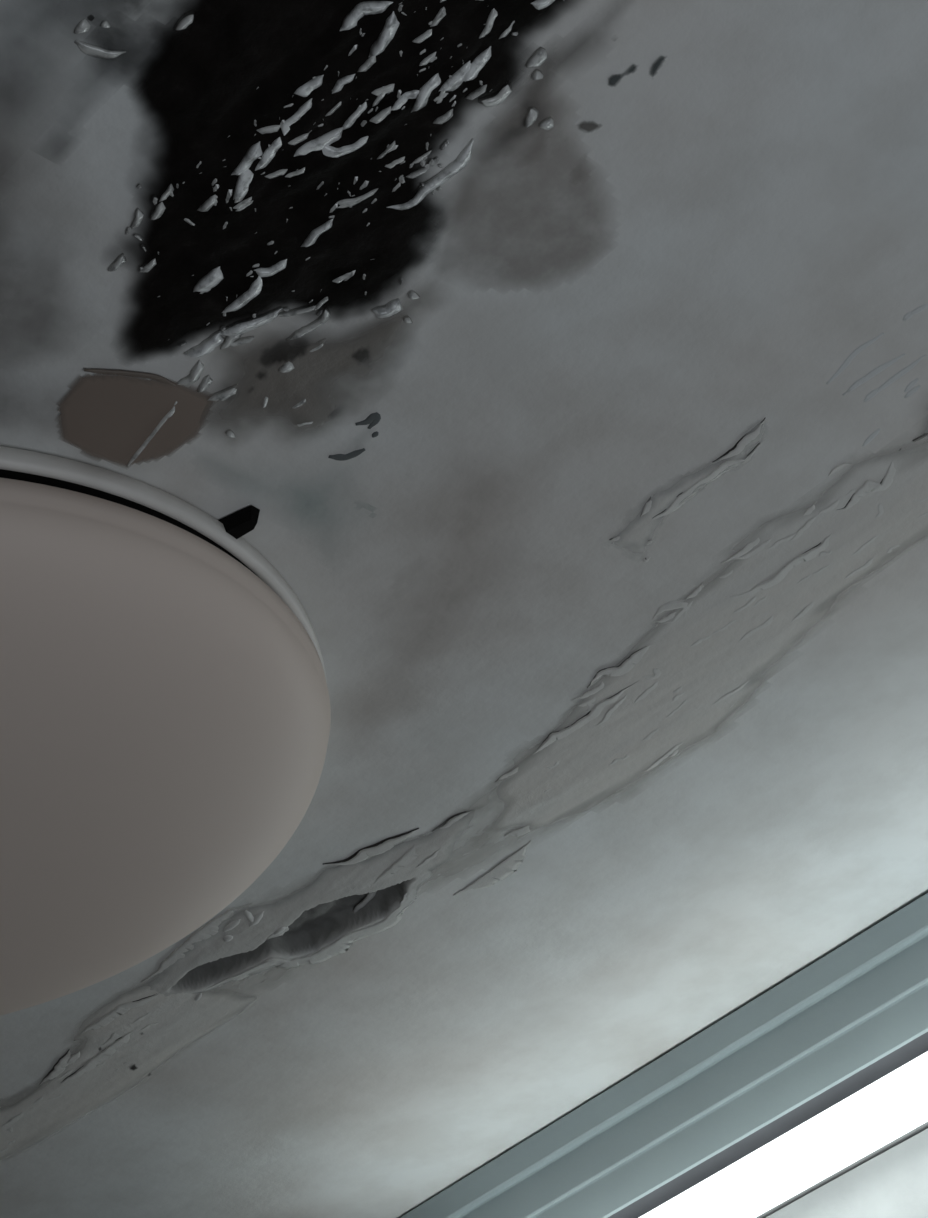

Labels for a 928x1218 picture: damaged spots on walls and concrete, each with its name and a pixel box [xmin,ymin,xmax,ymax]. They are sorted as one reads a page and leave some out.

water stain [74,18,126,60]
peeling [176,15,193,30]
peeling [526,47,548,80]
peeling [480,85,513,107]
peeling [524,107,554,131]
peeling [580,123,599,132]
mould [107,0,573,401]
peeling [59,312,413,467]
water stain [328,412,381,461]
flaking render [453,825,531,896]
flaking render [141,809,474,1001]